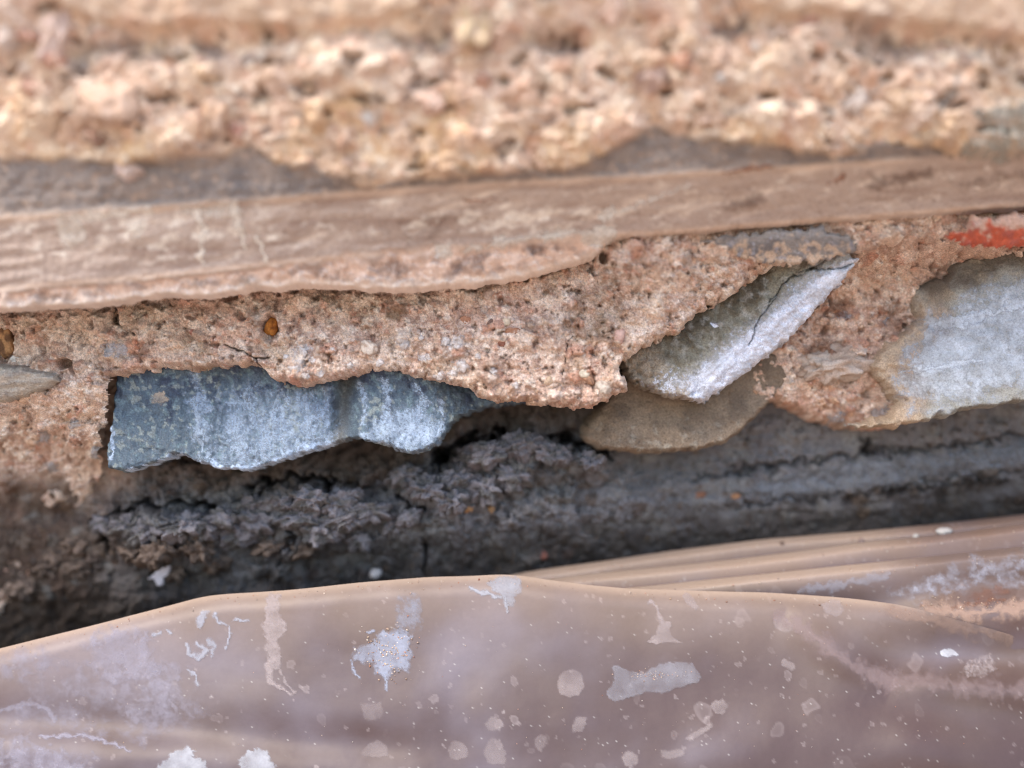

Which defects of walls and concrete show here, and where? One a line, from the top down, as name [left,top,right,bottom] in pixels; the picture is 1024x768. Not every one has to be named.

damp [923,600,1024,622]